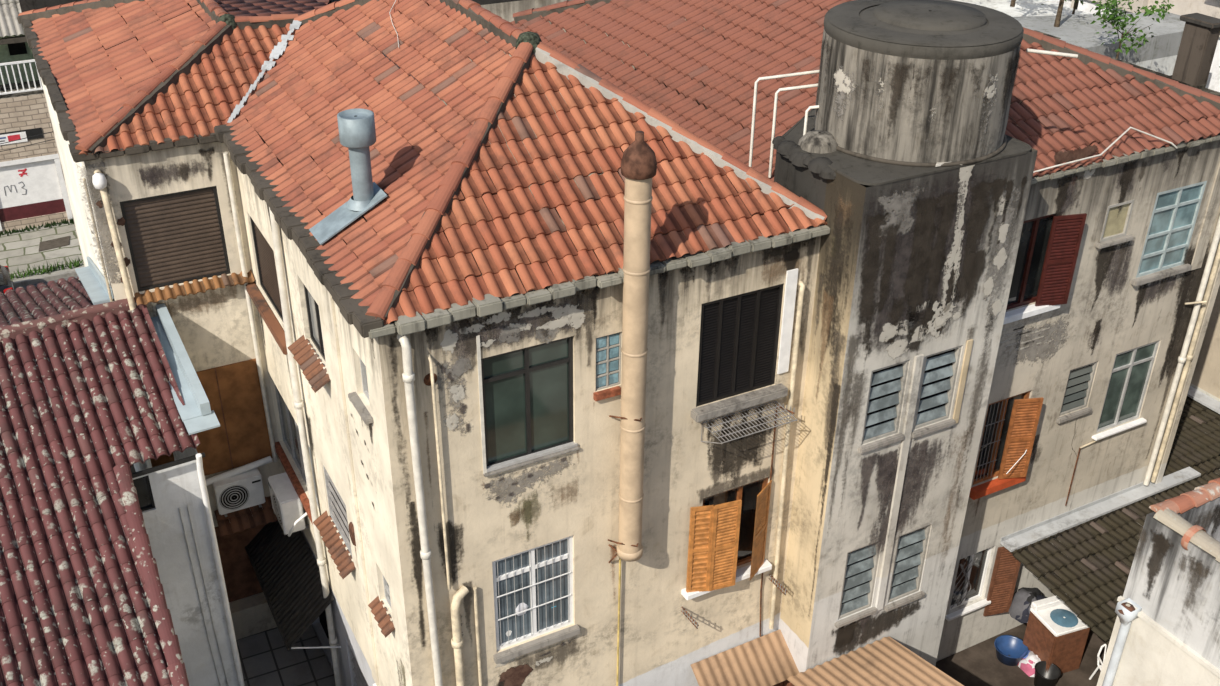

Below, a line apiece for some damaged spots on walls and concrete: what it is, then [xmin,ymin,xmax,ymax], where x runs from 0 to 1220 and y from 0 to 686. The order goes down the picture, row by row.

water stain [139,148,232,212]
peeling [435,299,586,434]
water stain [764,164,1007,518]
water stain [510,501,532,538]
water stain [858,440,942,553]
water stain [1137,531,1170,597]
water stain [1181,557,1209,606]